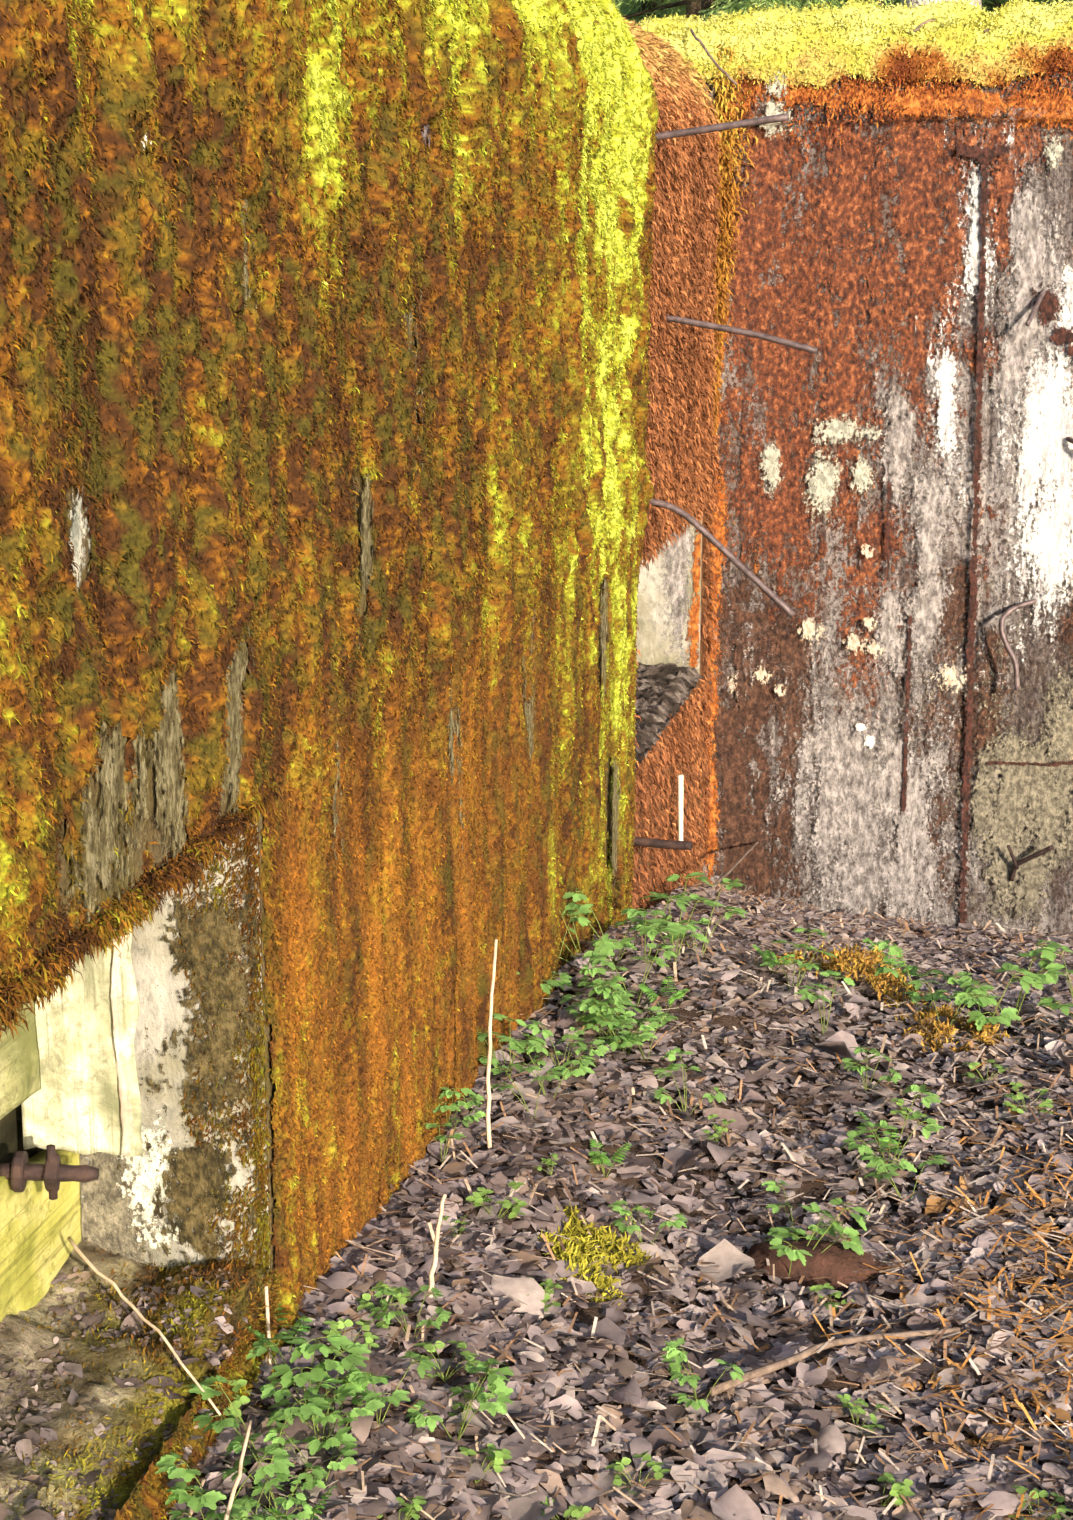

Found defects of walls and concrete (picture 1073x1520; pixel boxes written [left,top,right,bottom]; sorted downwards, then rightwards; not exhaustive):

leakage [659,526,696,665]
rust [686,71,1073,921]
leakage [711,107,1073,933]